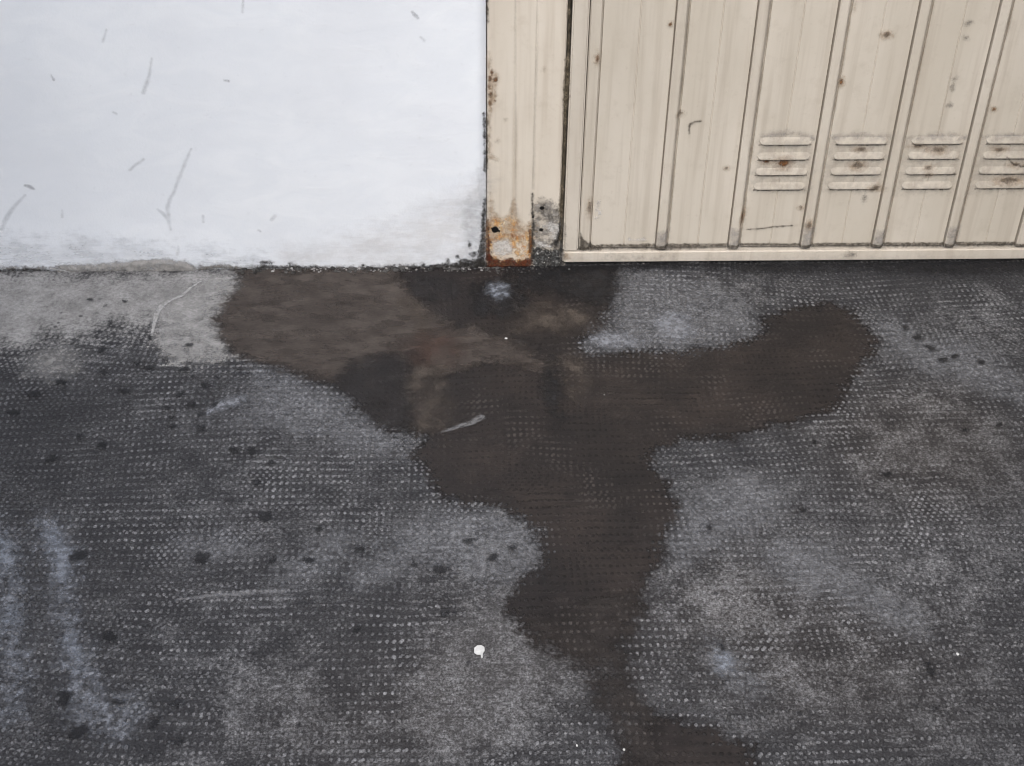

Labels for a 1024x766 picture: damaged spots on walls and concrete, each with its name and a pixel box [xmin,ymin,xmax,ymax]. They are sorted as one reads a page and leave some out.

rust [485,208,533,267]
water stain [206,199,1024,766]
water stain [167,529,259,570]